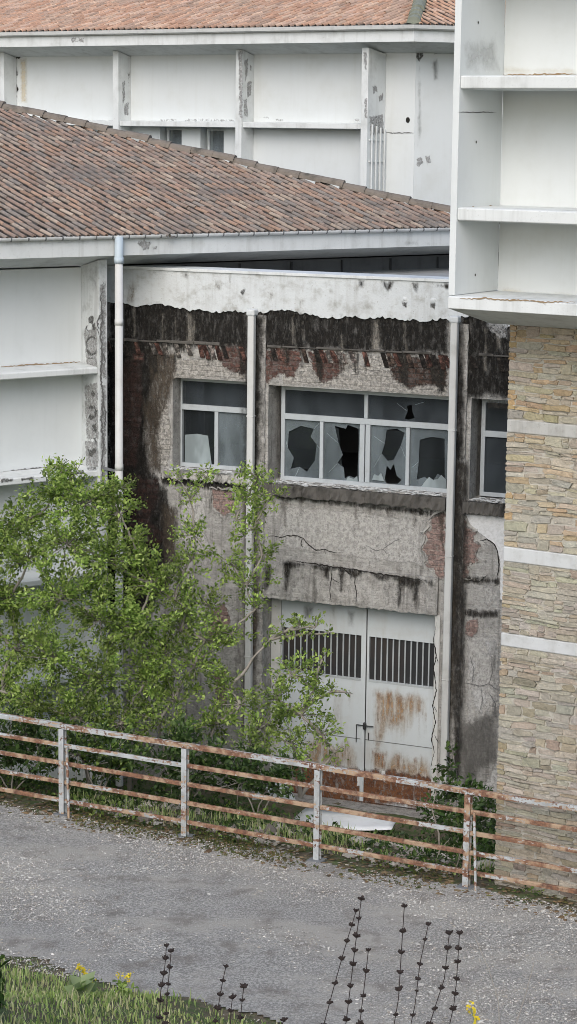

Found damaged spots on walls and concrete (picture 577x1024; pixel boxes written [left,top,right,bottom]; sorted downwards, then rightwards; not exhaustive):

peeling [364,86,384,135]
flaking render [159,346,246,381]
flaking render [266,349,449,396]
flaking render [84,285,171,546]
water stain [76,303,510,799]
crack [275,535,426,604]
flaking render [277,507,446,581]
crack [471,539,500,582]
rust [381,695,420,723]